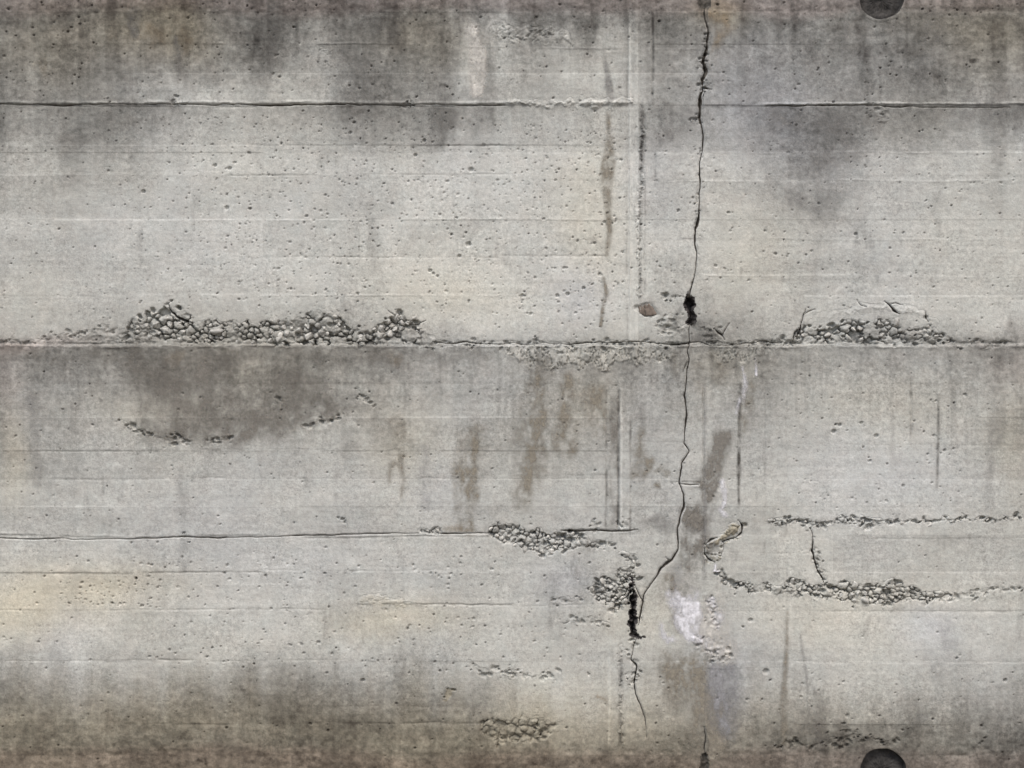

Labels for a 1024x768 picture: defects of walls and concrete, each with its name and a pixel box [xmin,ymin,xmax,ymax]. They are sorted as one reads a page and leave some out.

leakage [468,24,486,97]
crack [687,8,711,297]
spalling [0,94,1024,379]
leakage [455,431,479,499]
leakage [522,375,546,491]
spalling [487,518,644,631]
crack [388,308,815,737]
crack [809,528,825,582]
spalling [691,522,1024,666]
spalling [766,511,1024,531]
leakage [661,592,734,733]
spalling [479,713,562,749]